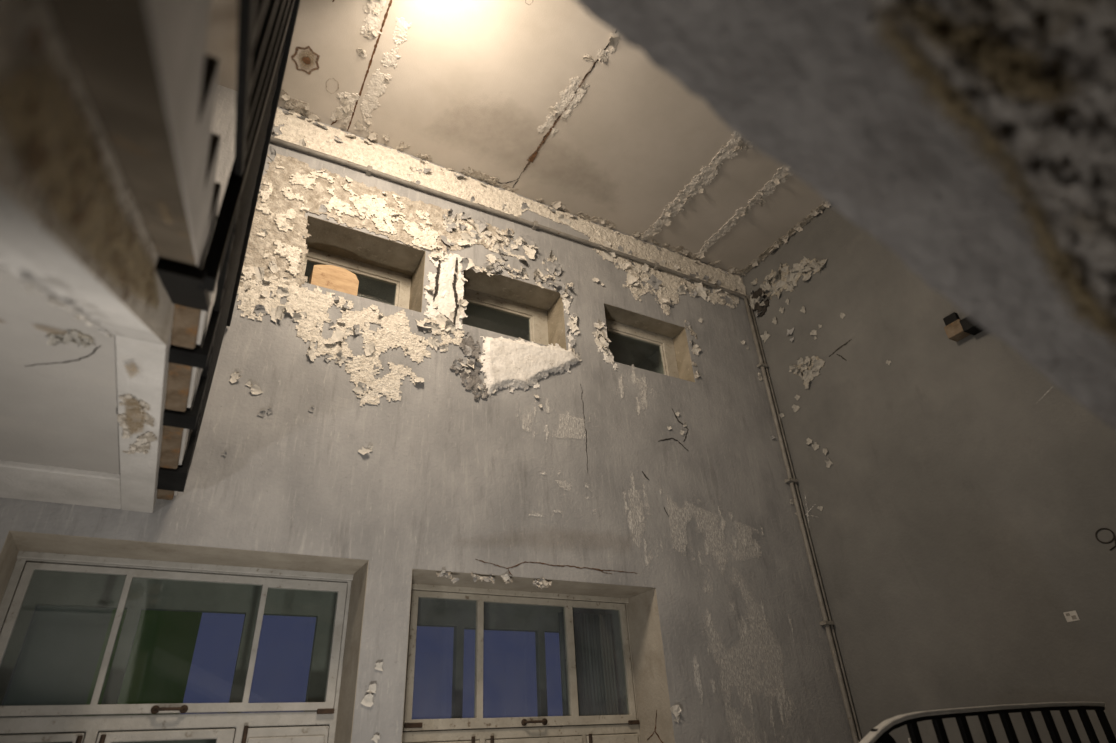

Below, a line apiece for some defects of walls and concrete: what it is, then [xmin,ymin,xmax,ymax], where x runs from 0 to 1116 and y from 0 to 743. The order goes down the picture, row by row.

crack [331,0,392,131]
crack [486,32,616,187]
spalling [864,0,1116,325]
peeling [237,0,831,407]
crack [31,346,101,366]
peeling [47,329,95,348]
peeling [779,355,825,418]
spalling [117,394,157,454]
crack [658,409,688,451]
crack [476,559,635,575]
peeling [361,684,376,707]